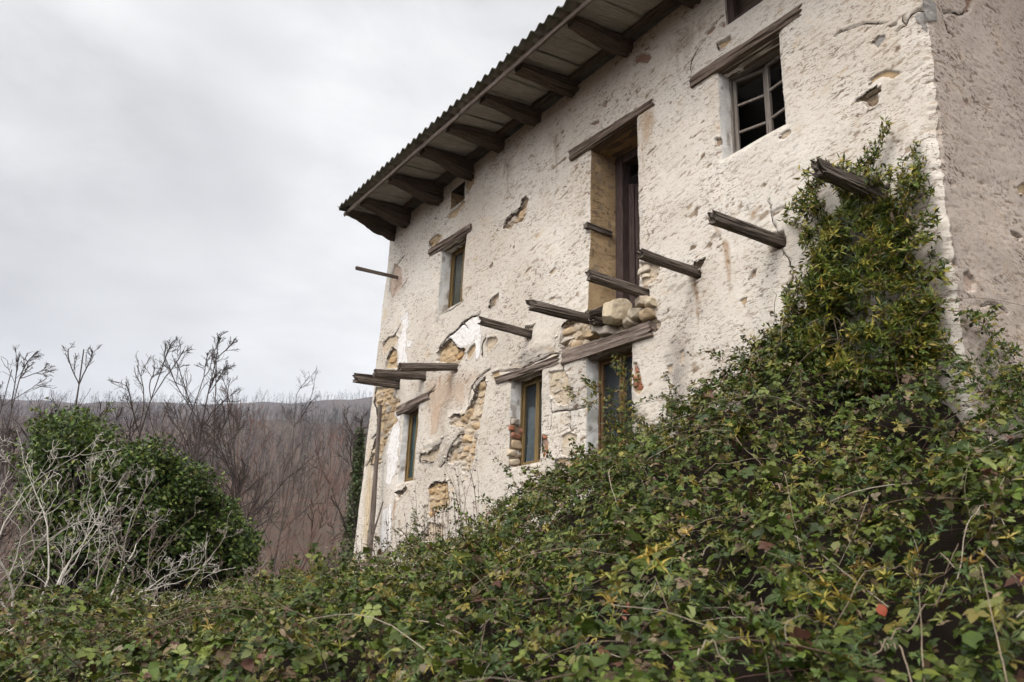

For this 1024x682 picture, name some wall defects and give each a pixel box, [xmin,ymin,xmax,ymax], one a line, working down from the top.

spalling [855,71,900,107]
spalling [503,194,529,231]
spalling [555,263,661,349]
peeling [436,317,498,366]
spalling [550,371,573,406]
spalling [419,372,499,476]
flaking render [506,417,523,467]
spalling [370,388,408,552]
spalling [425,478,450,543]